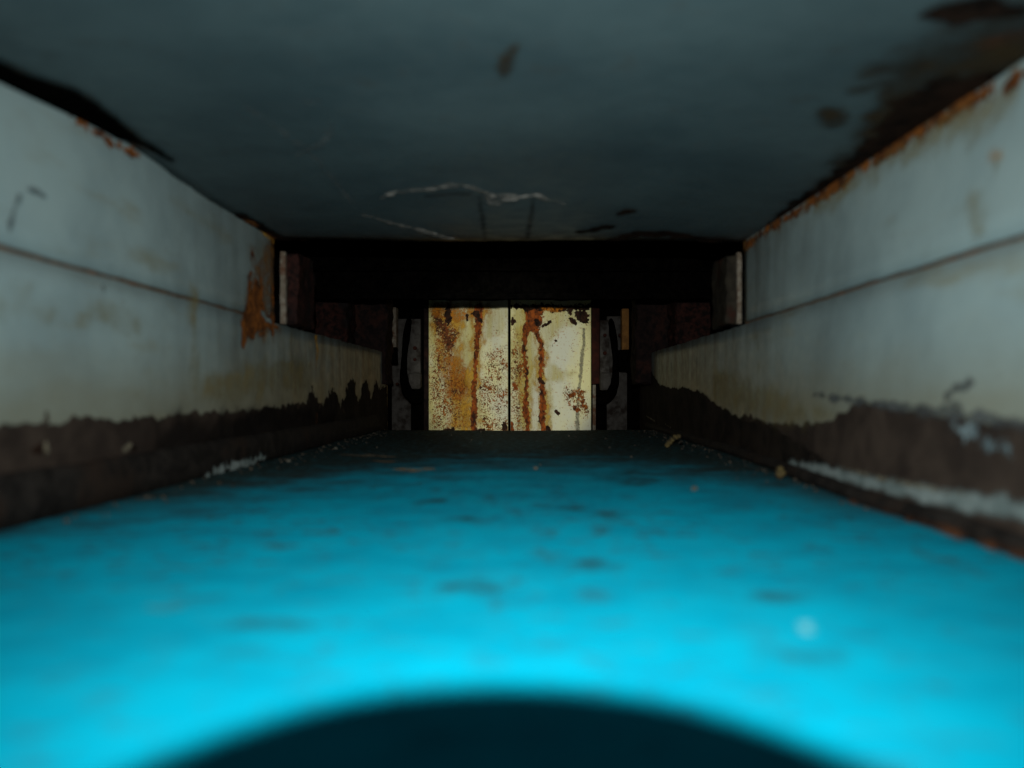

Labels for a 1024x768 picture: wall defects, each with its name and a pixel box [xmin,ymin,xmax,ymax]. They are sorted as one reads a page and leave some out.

corrosion [0,62,175,162]
corrosion [744,0,1024,250]
crack [364,185,565,240]
corrosion [235,214,291,349]
corrosion [429,302,591,431]